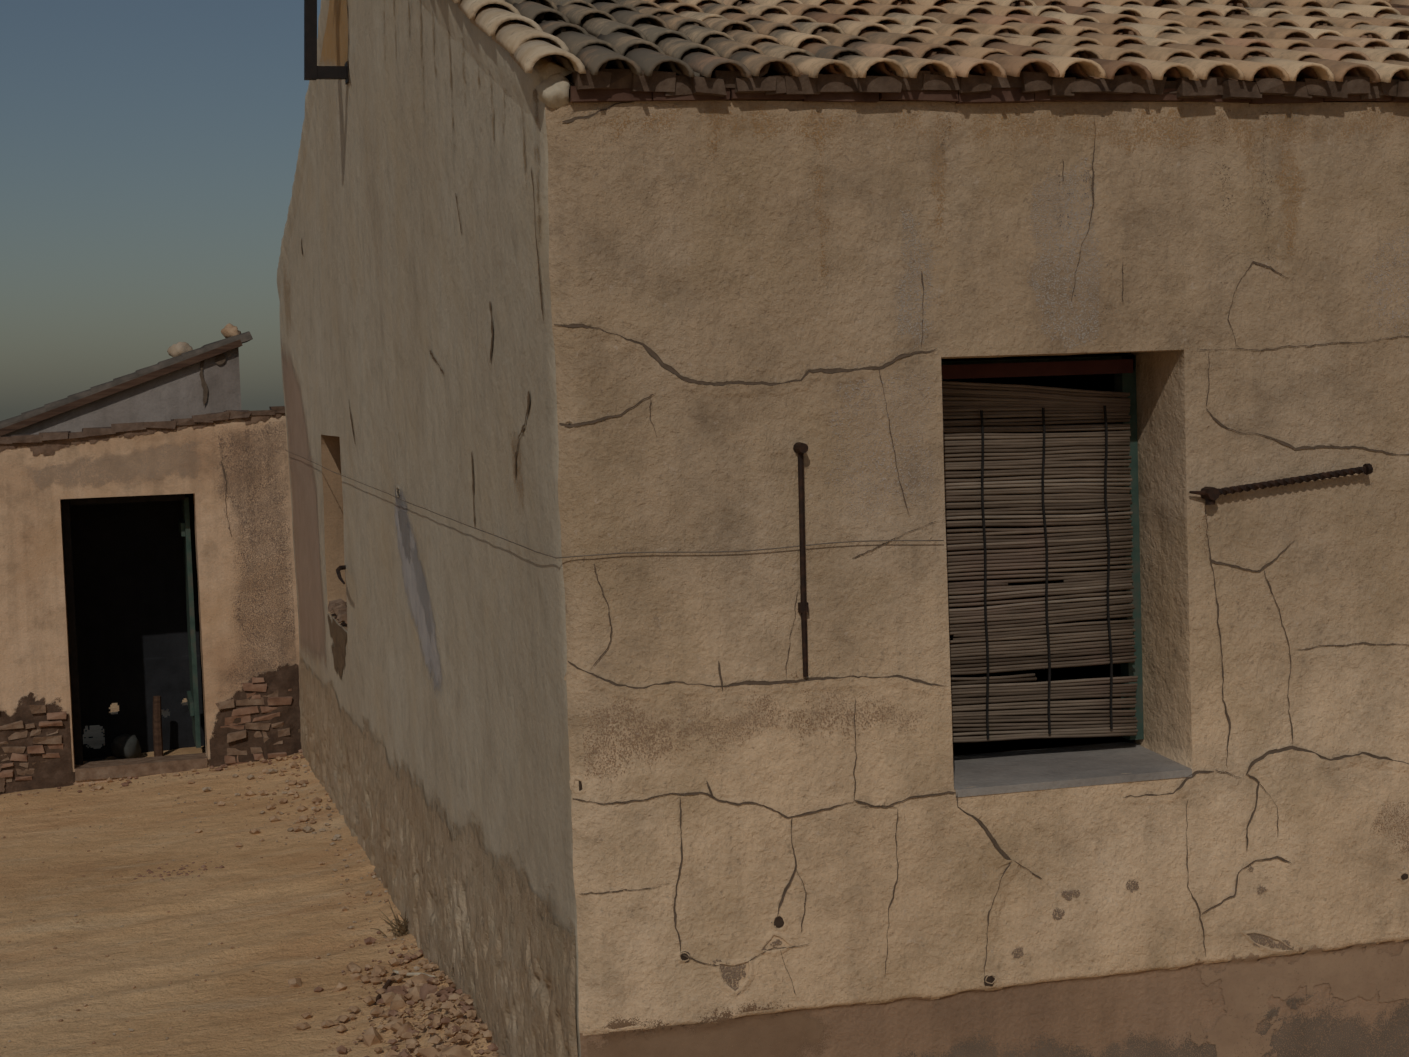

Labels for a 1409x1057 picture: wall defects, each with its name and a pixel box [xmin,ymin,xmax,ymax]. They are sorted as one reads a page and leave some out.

crack [1062,114,1096,301]
flaking render [0,413,285,456]
crack [487,302,495,361]
crack [514,169,938,558]
crack [1204,261,1409,455]
flaking render [0,692,75,794]
flaking render [208,614,847,1057]
crack [564,564,1042,993]
crack [1123,510,1409,955]
water stain [881,994,1409,1057]